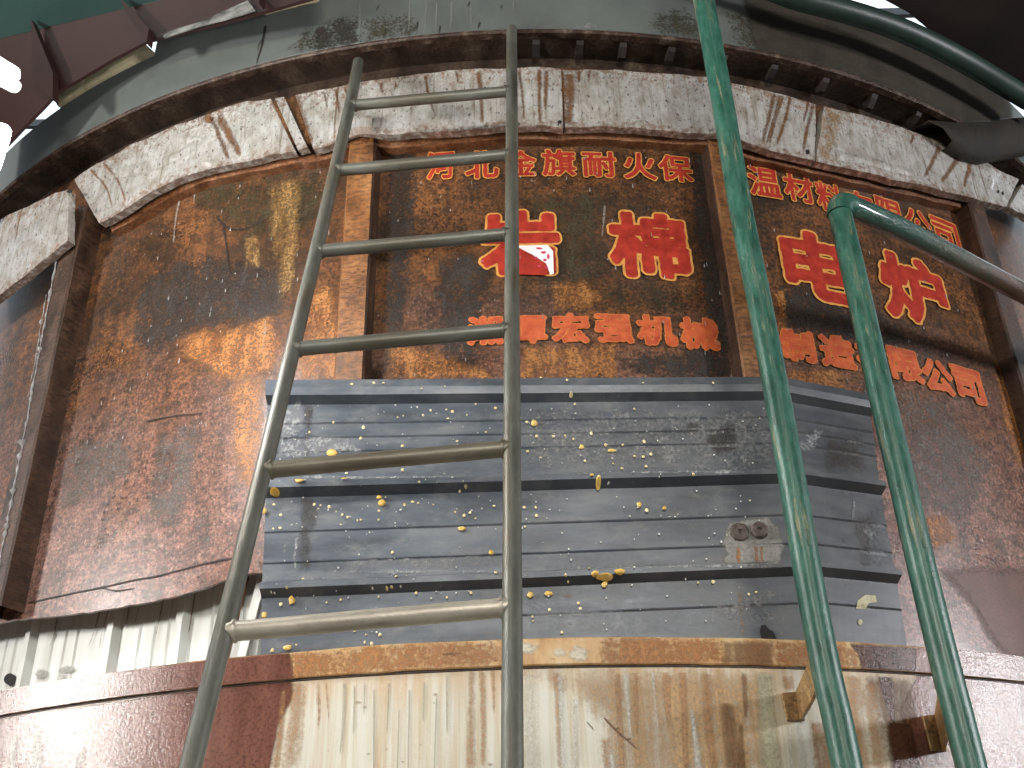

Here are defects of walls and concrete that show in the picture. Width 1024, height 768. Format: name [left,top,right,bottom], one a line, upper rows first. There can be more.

corrosion [112,70,718,296]
corrosion [742,95,962,213]
corrosion [942,159,972,187]
corrosion [181,317,281,487]
corrosion [299,353,335,380]
corrosion [303,286,337,340]
corrosion [388,347,488,379]
corrosion [520,344,617,378]
corrosion [554,280,599,310]
corrosion [0,660,206,768]
corrosion [202,641,499,768]
corrosion [584,637,809,768]